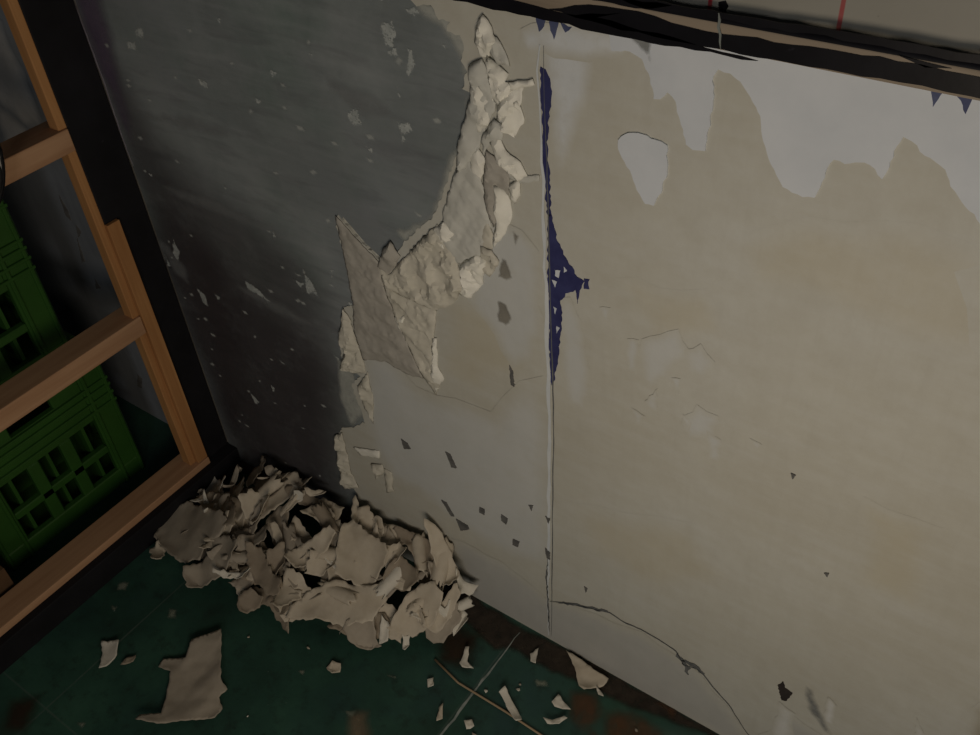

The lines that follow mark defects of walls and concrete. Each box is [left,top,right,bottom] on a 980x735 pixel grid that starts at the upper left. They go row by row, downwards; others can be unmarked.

peeling [73,0,540,524]
spalling [441,500,469,531]
crack [536,45,749,735]
peeling [609,35,980,223]